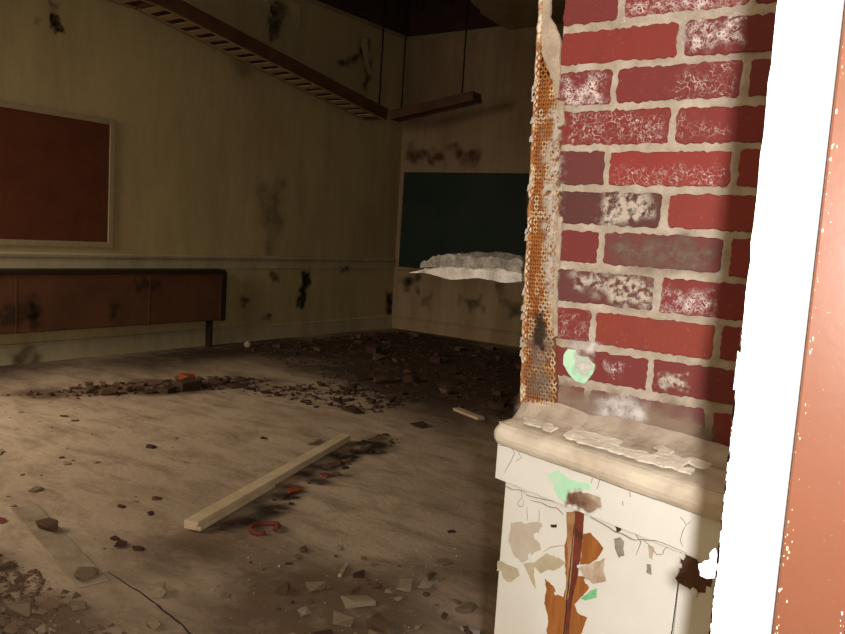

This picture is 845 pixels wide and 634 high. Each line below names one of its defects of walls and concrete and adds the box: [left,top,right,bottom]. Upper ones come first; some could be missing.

spalling [317,0,500,37]
corrosion [532,87,557,296]
peeling [730,329,743,437]
crack [498,445,563,521]
spalling [499,399,731,532]
peeling [497,491,606,634]
spalling [614,526,624,558]
crack [591,517,690,555]
peeling [690,543,720,634]